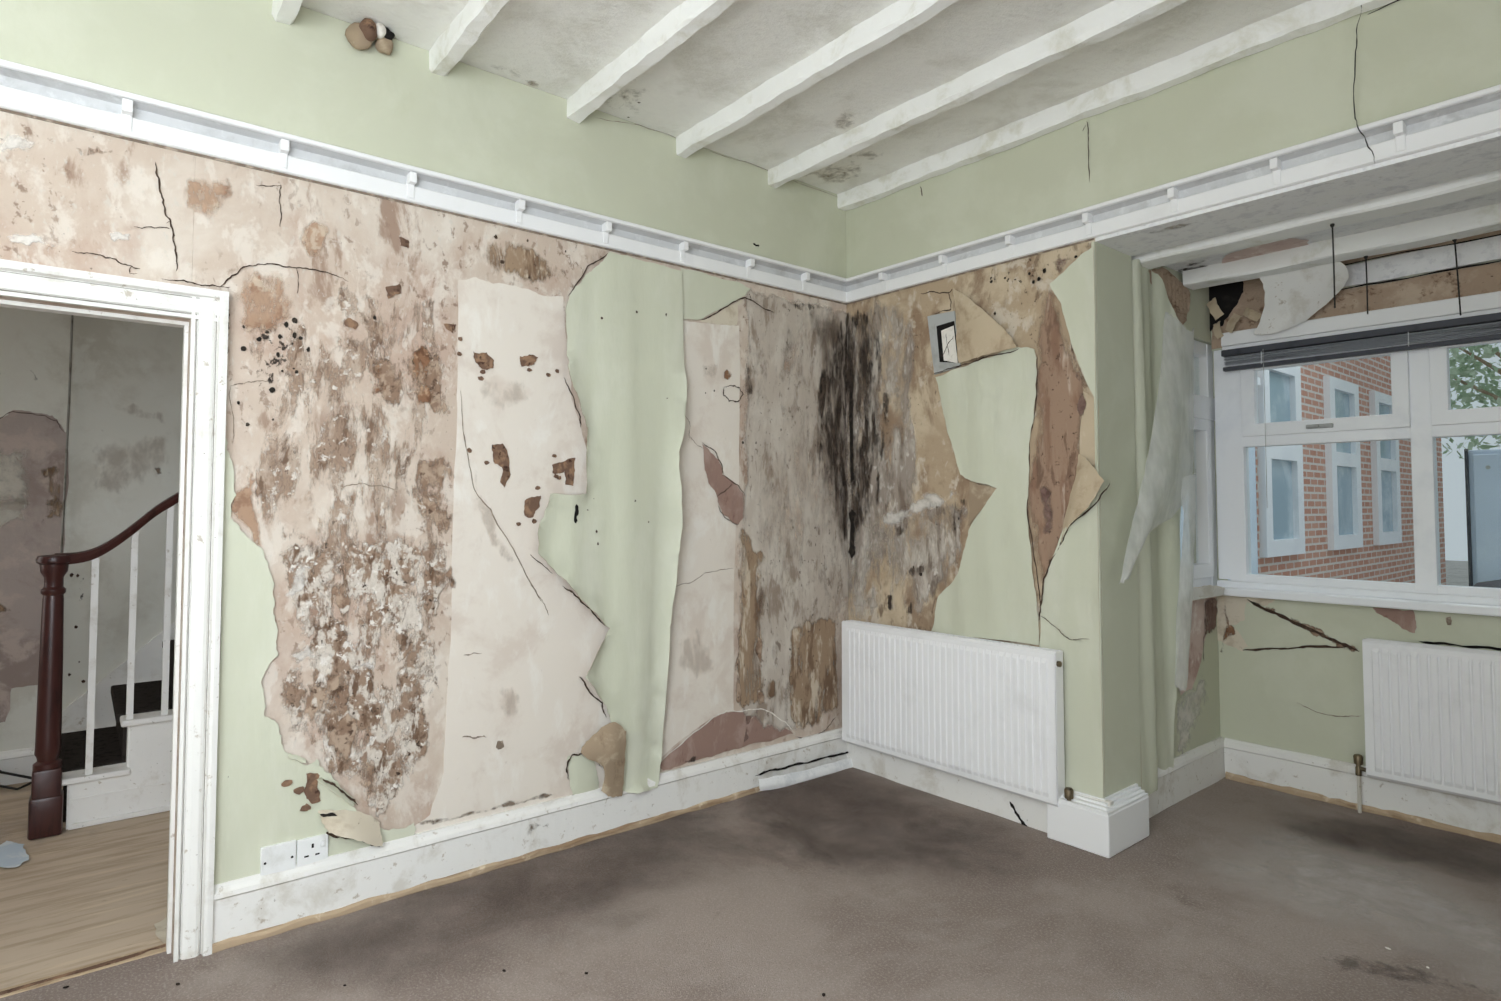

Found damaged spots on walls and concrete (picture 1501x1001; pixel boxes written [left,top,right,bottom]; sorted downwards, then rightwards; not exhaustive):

crack [72,162,345,443]
flaking render [444,324,494,381]
flaking render [1209,278,1265,349]
flaking render [1308,230,1501,320]
flaking render [467,444,511,487]
flaking render [516,454,576,526]
flaking render [690,436,746,525]
leakage [735,289,965,730]
flaking render [0,410,69,723]
flaking render [1177,595,1359,696]
flaking render [660,708,793,770]
flaking render [304,773,321,804]